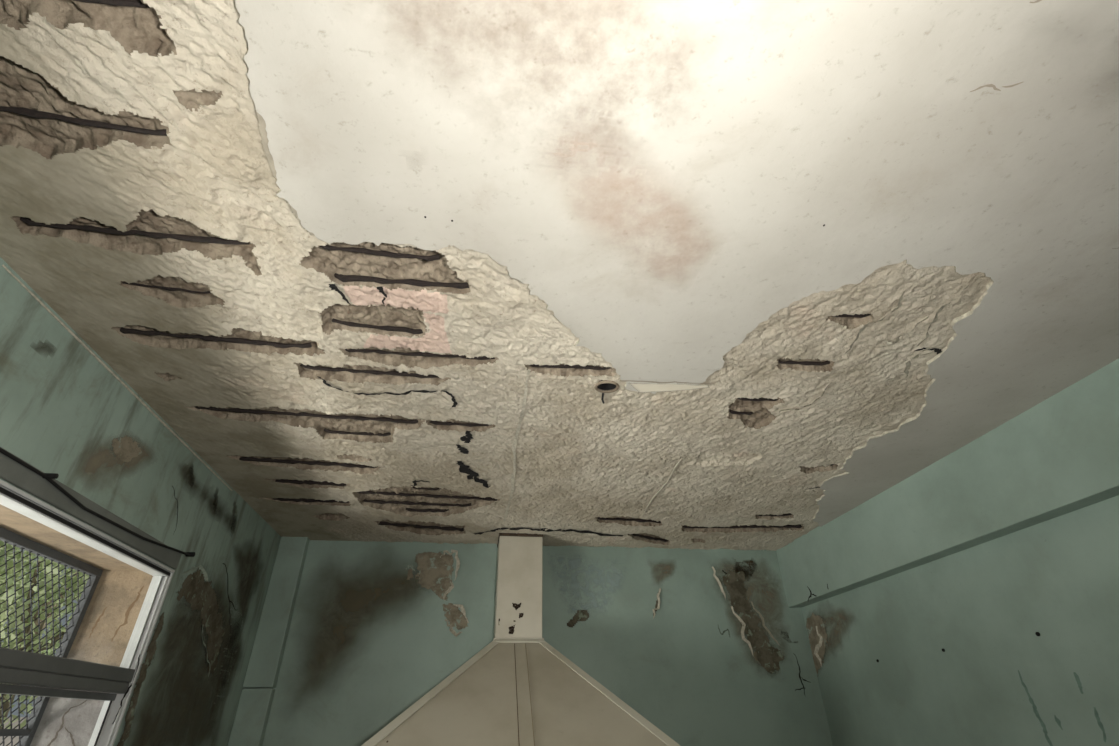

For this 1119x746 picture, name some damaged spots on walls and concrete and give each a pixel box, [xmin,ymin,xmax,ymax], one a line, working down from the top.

spalling [0,0,991,637]
leakage [131,549,259,746]
peeling [712,567,784,674]
peeling [806,612,827,677]